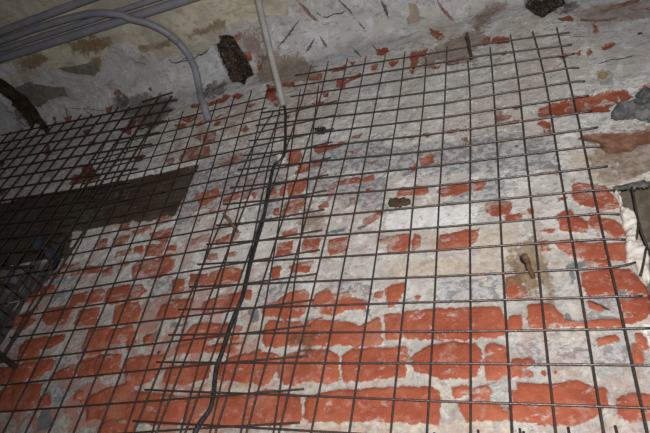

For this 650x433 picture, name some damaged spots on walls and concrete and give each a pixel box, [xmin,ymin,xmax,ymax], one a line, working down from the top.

spalling [525,0,567,18]
peeling [482,35,510,55]
peeling [0,0,288,133]
peeling [410,48,428,74]
peeling [336,73,361,88]
peeling [265,81,295,107]
peeling [537,90,633,133]
peeling [166,103,223,165]
peeling [578,129,650,153]
peeling [287,141,345,174]
peeling [411,154,434,173]
corrosion [506,236,556,307]